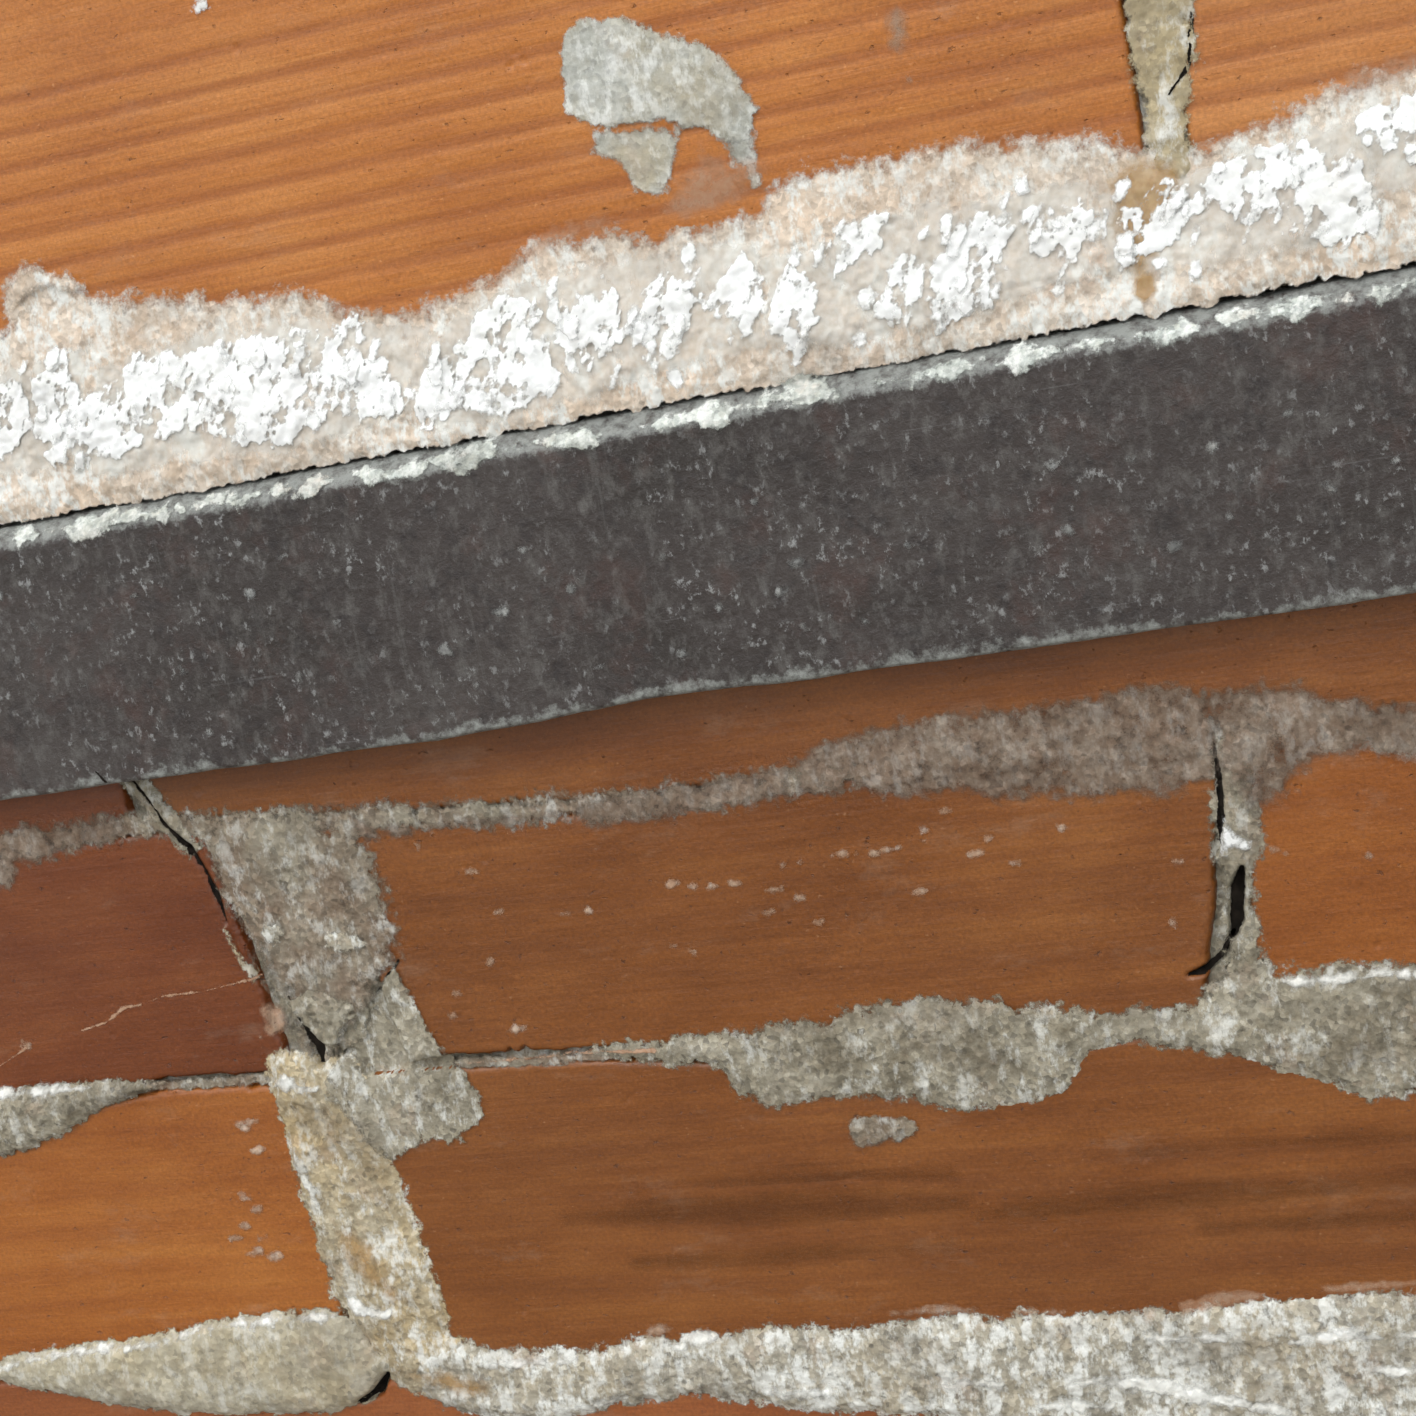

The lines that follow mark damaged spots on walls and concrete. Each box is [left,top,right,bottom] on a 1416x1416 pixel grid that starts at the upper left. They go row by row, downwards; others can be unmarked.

damp [857,91,1416,336]
damp [0,210,890,471]
damp [875,337,1114,390]
damp [1135,278,1416,349]
damp [352,434,516,486]
damp [12,472,332,547]
crack [95,772,227,921]
crack [1188,742,1246,976]
crack [287,996,326,1062]